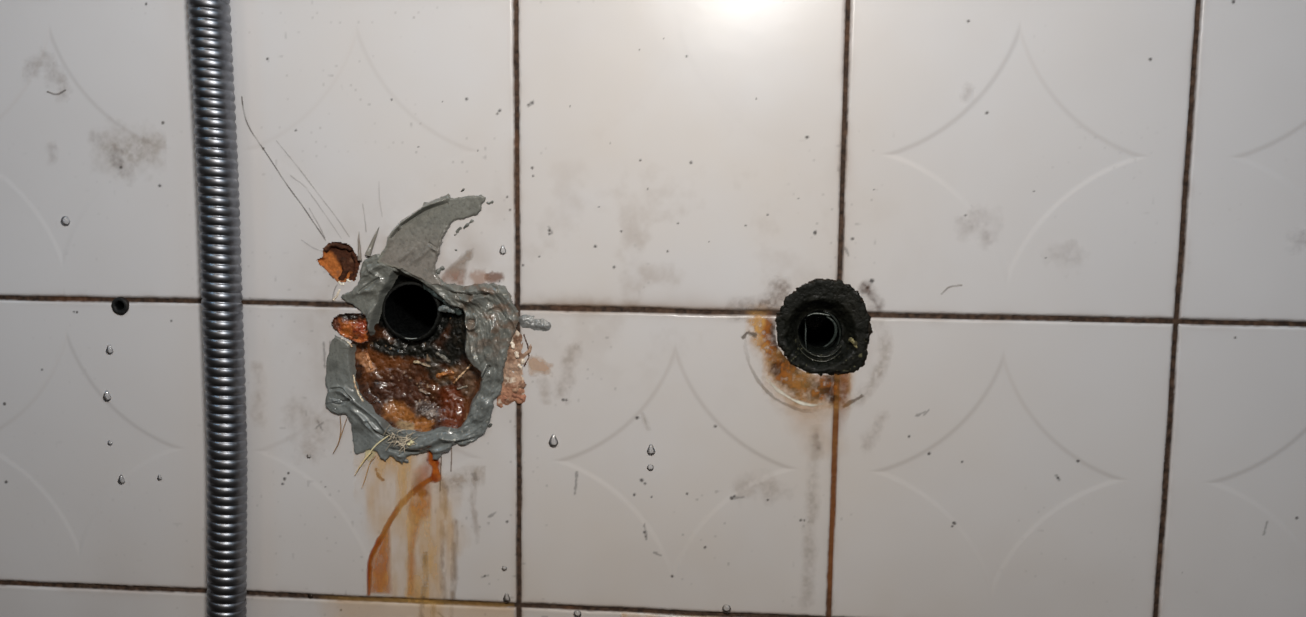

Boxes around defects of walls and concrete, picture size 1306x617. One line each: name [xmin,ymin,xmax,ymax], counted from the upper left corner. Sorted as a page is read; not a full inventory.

spalling [316,242,481,432]
peeling [501,381,526,404]
rust [750,315,849,406]
rust [367,451,441,601]